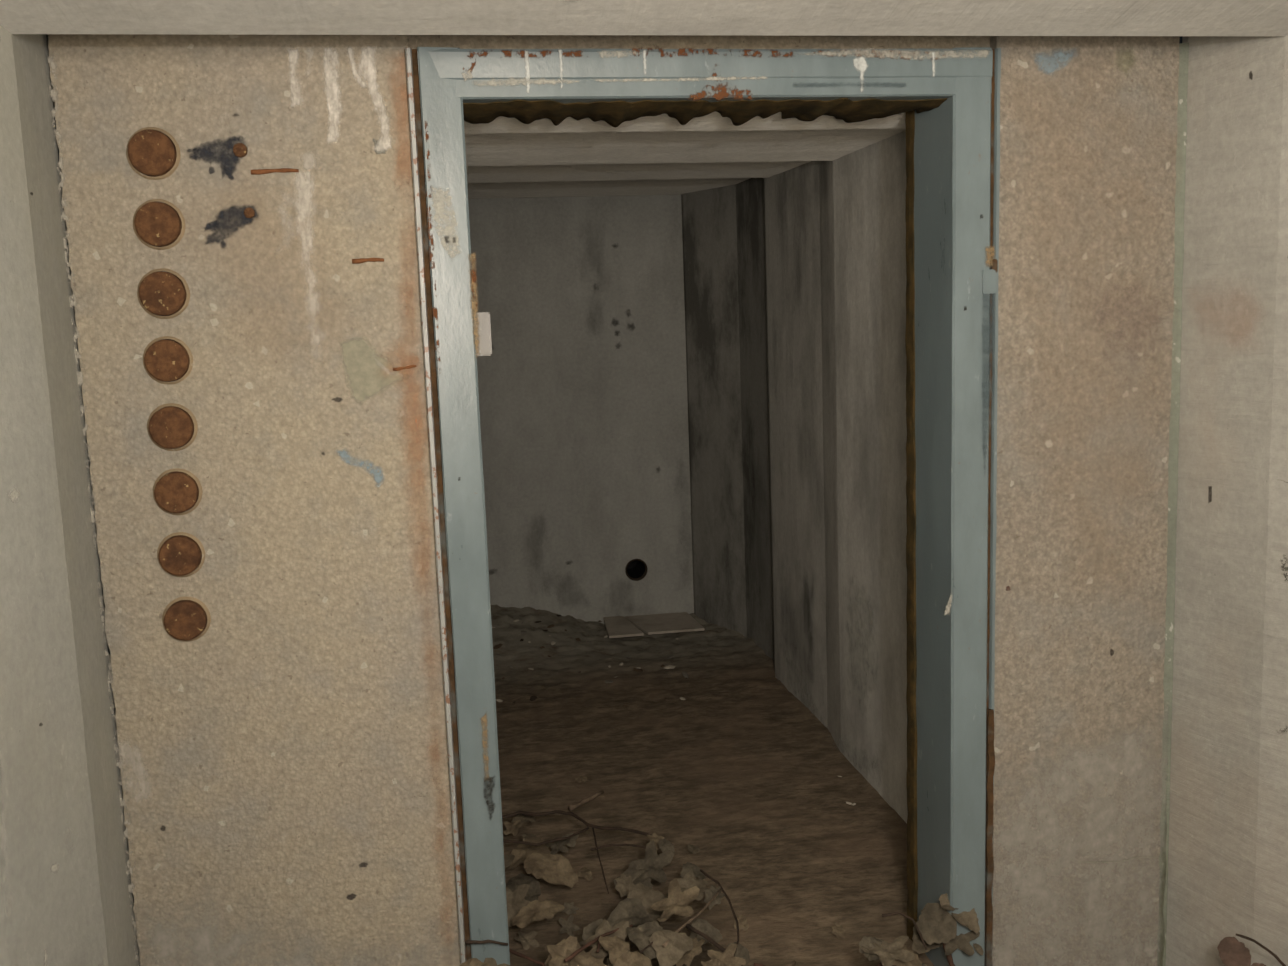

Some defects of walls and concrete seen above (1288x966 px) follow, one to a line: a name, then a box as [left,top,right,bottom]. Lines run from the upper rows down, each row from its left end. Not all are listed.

rust [463,50,582,72]
rust [632,48,793,57]
rust [689,73,752,100]